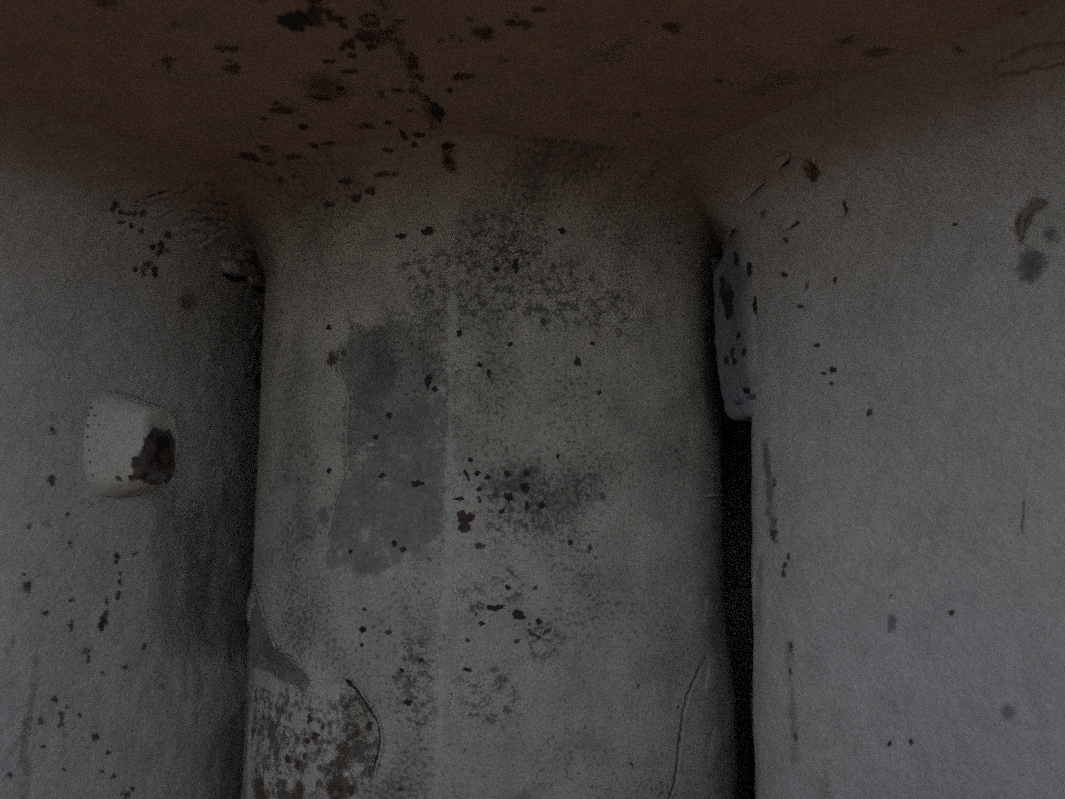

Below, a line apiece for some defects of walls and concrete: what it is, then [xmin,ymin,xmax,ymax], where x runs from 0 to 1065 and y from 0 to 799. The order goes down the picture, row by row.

damp [401,211,630,412]
damp [1016,199,1063,282]
spalling [115,428,176,486]
spalling [243,581,384,799]
damp [395,425,559,799]
crack [668,652,710,799]